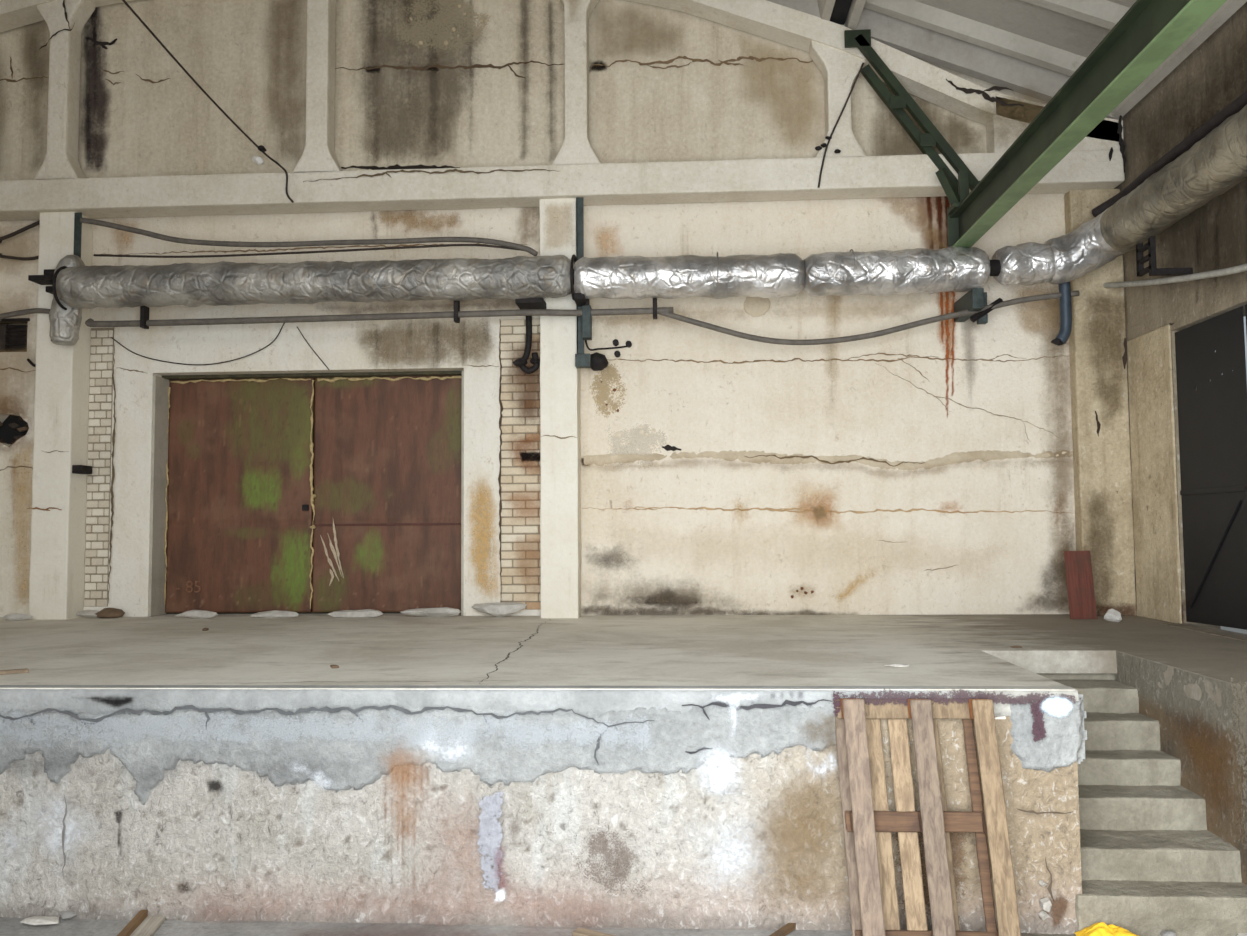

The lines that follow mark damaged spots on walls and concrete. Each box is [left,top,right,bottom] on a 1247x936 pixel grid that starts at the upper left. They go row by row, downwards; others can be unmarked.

spalling [91,697,132,706]
spalling [208,781,222,791]